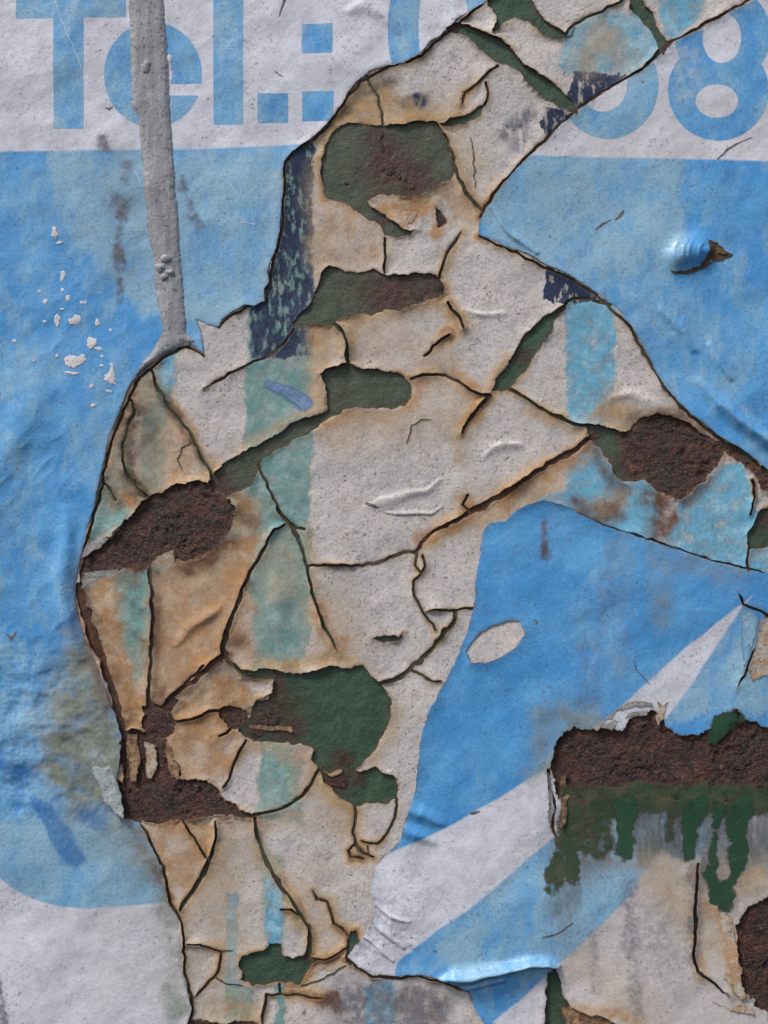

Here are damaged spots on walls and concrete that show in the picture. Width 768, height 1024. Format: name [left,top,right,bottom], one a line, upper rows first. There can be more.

peeling [446,0,578,115]
peeling [320,105,484,238]
peeling [209,363,412,496]
crack [76,0,768,788]
rust [571,393,768,541]
rust [75,422,359,890]
peeling [238,665,398,807]
rust [536,701,768,828]
crack [136,763,468,1024]
crack [692,863,730,999]
rust [664,872,768,1015]
water stain [687,812,768,959]